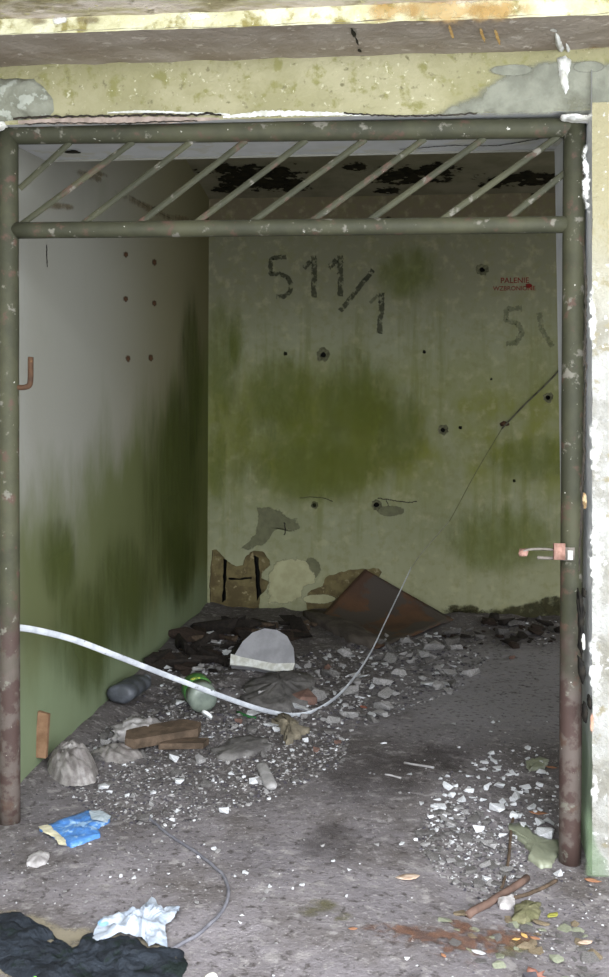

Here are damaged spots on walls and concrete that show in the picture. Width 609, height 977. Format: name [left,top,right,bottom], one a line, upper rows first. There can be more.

corrosion [373,1,510,45]
peeling [371,499,404,516]
spalling [209,507,382,610]